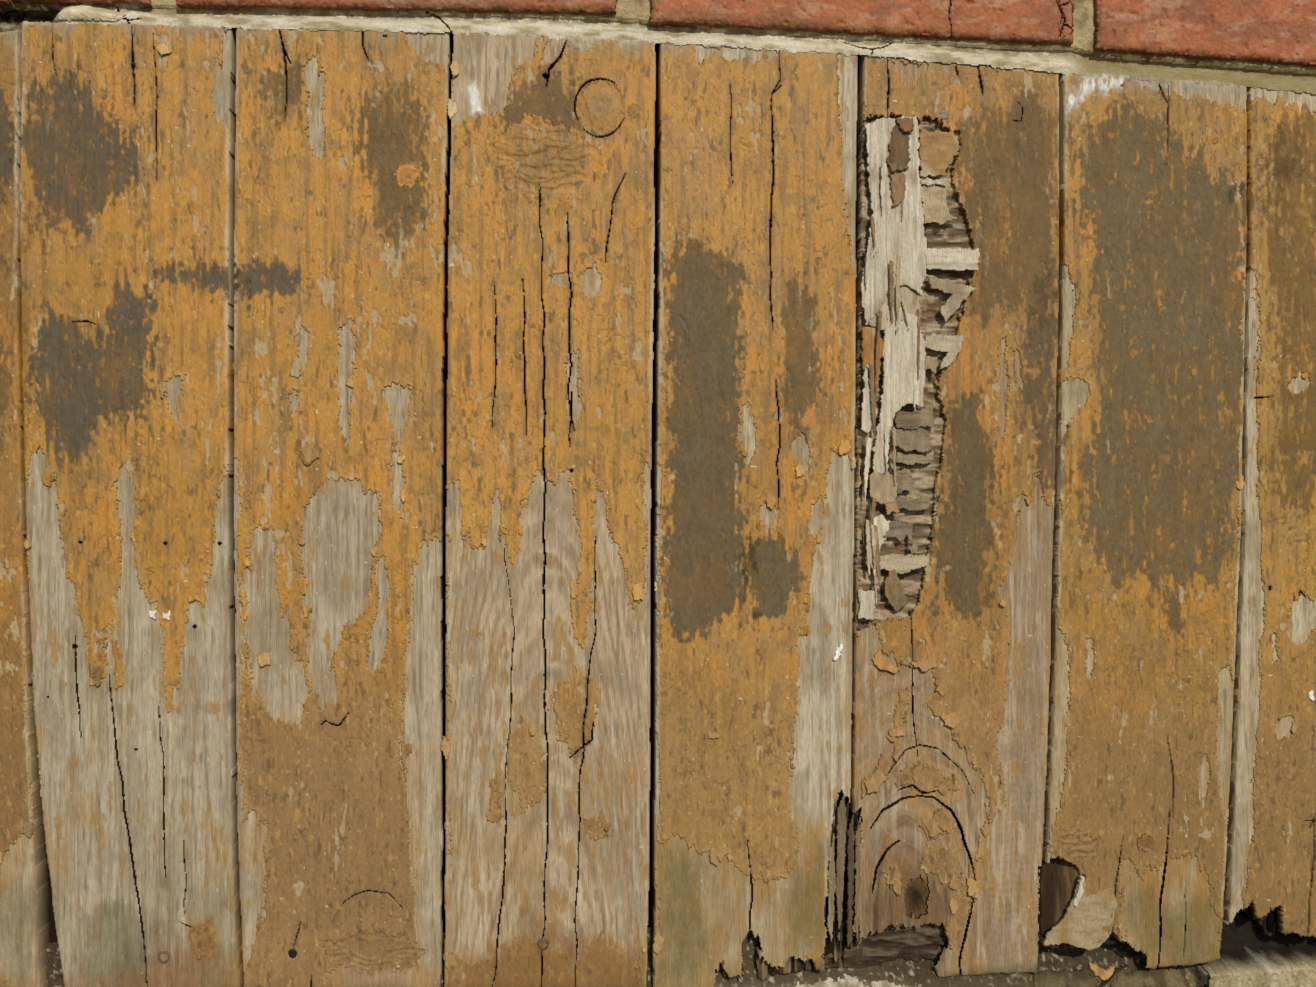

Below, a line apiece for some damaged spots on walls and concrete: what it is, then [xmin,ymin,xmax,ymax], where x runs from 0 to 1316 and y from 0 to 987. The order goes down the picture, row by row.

damp [0,64,139,241]
crack [75,635,192,986]
damp [26,258,301,472]
crack [492,188,596,987]
peeling [0,381,1095,987]
damp [661,238,806,643]
crack [769,69,781,330]
peeling [886,117,960,225]
crack [870,682,976,974]
peeling [924,355,939,374]
damp [990,93,1305,638]
peeling [1111,269,1316,970]